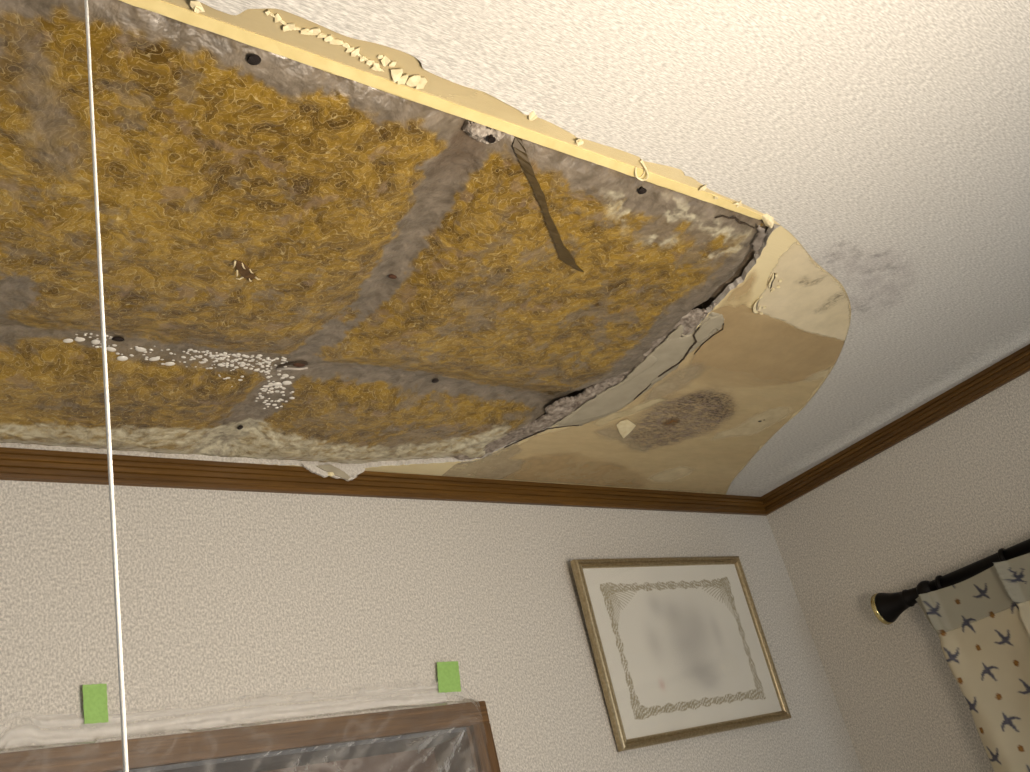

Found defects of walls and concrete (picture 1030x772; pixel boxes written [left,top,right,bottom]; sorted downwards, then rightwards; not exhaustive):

peeling [190,1,205,13]
peeling [265,10,427,89]
spalling [453,303,725,465]
damp [474,278,844,493]